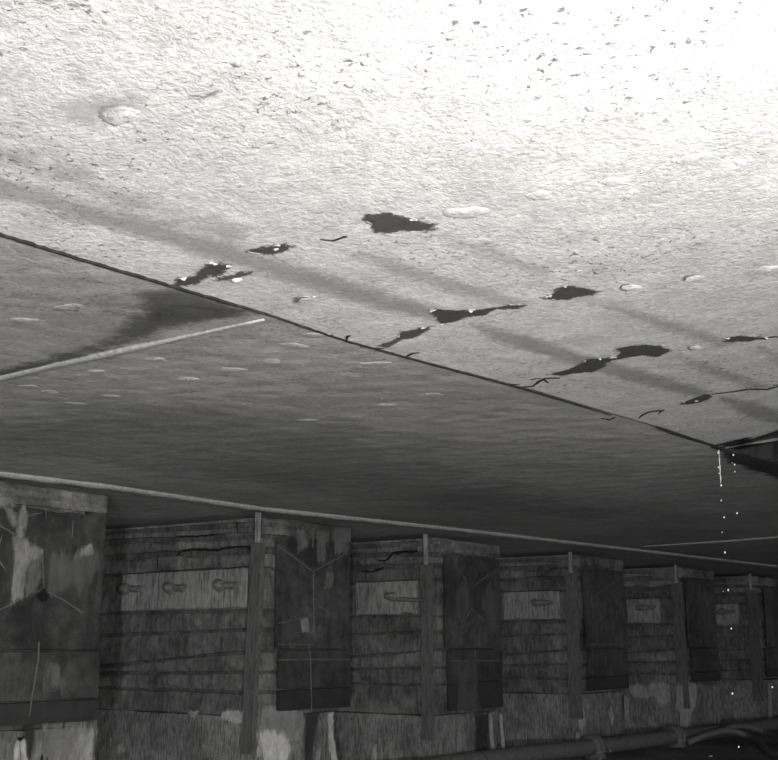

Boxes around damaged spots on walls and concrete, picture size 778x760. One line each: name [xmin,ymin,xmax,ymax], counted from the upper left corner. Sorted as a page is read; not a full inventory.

peeling [362,212,438,234]
peeling [173,262,253,287]
water stain [82,210,428,313]
peeling [245,243,293,255]
peeling [542,285,601,300]
water stain [0,291,241,376]
peeling [379,305,526,347]
peeling [546,345,670,376]
crack [713,385,778,395]
water stain [714,431,778,478]